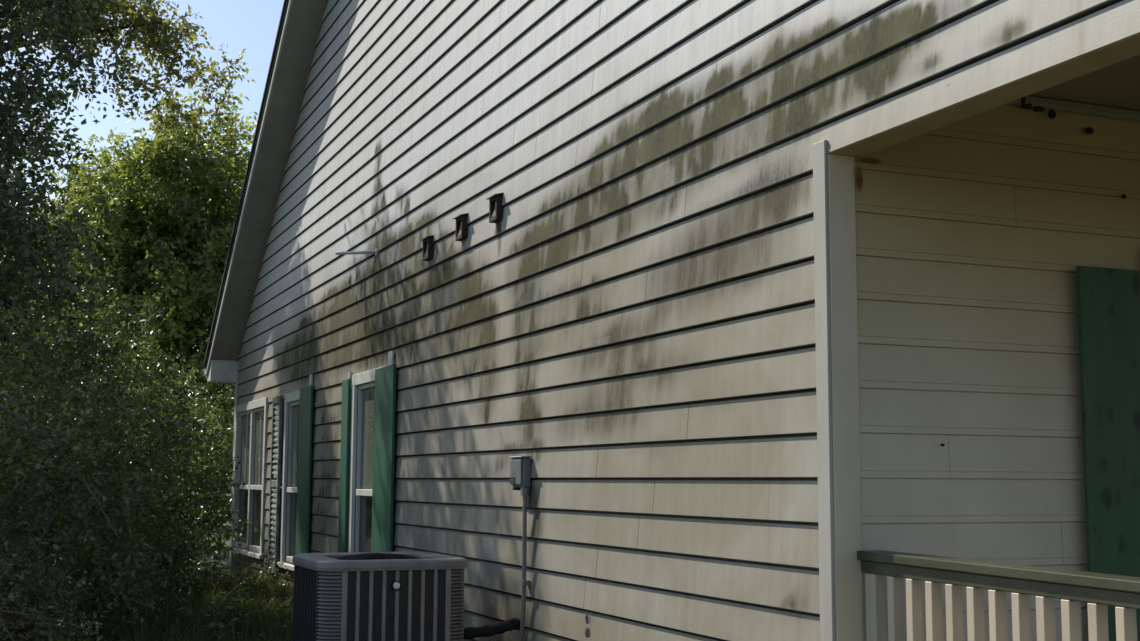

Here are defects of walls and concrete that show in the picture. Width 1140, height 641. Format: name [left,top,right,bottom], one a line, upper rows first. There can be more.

damp [277,146,497,381]
damp [497,2,937,467]
damp [528,486,541,546]